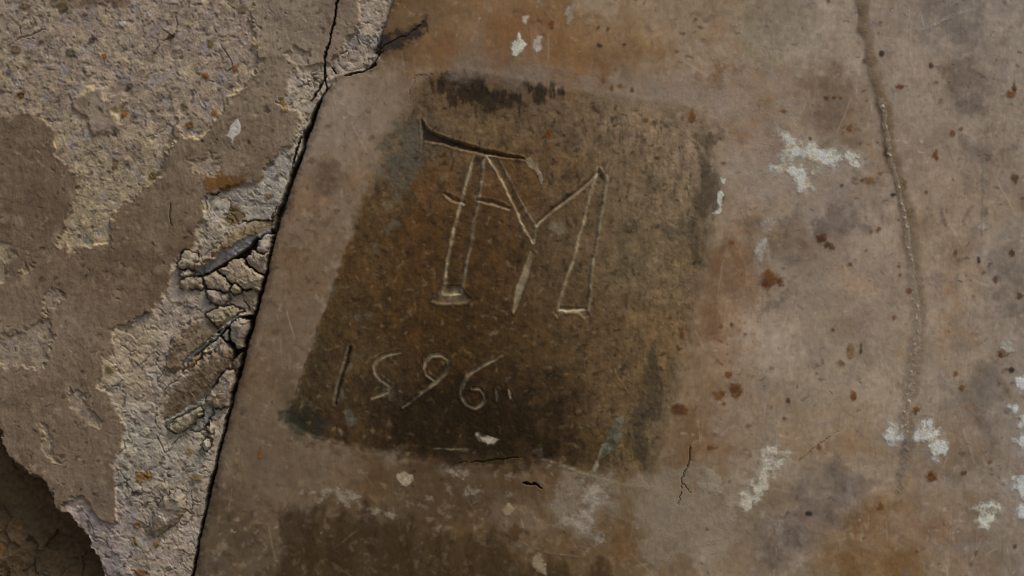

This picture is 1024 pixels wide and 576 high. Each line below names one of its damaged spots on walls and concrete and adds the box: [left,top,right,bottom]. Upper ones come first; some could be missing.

damp [430,70,564,113]
damp [769,131,863,193]
damp [858,1,949,462]
spalling [0,0,393,576]
crack [149,0,381,570]
corrosion [762,270,782,289]
crack [677,445,692,506]
damp [735,445,791,512]
damp [973,501,1001,530]